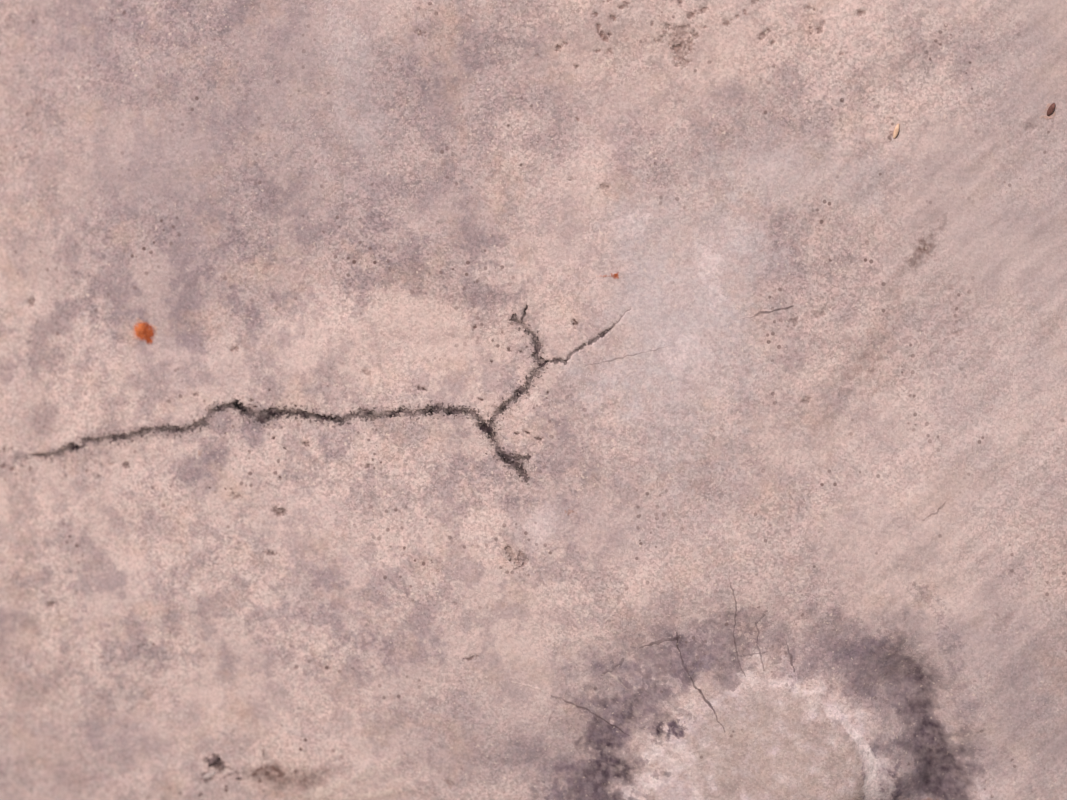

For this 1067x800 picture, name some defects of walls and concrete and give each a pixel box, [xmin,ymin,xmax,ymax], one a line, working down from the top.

rust [130,317,158,346]
crack [11,302,670,487]
crack [728,578,795,677]
crack [600,632,725,732]
water stain [503,578,1032,800]